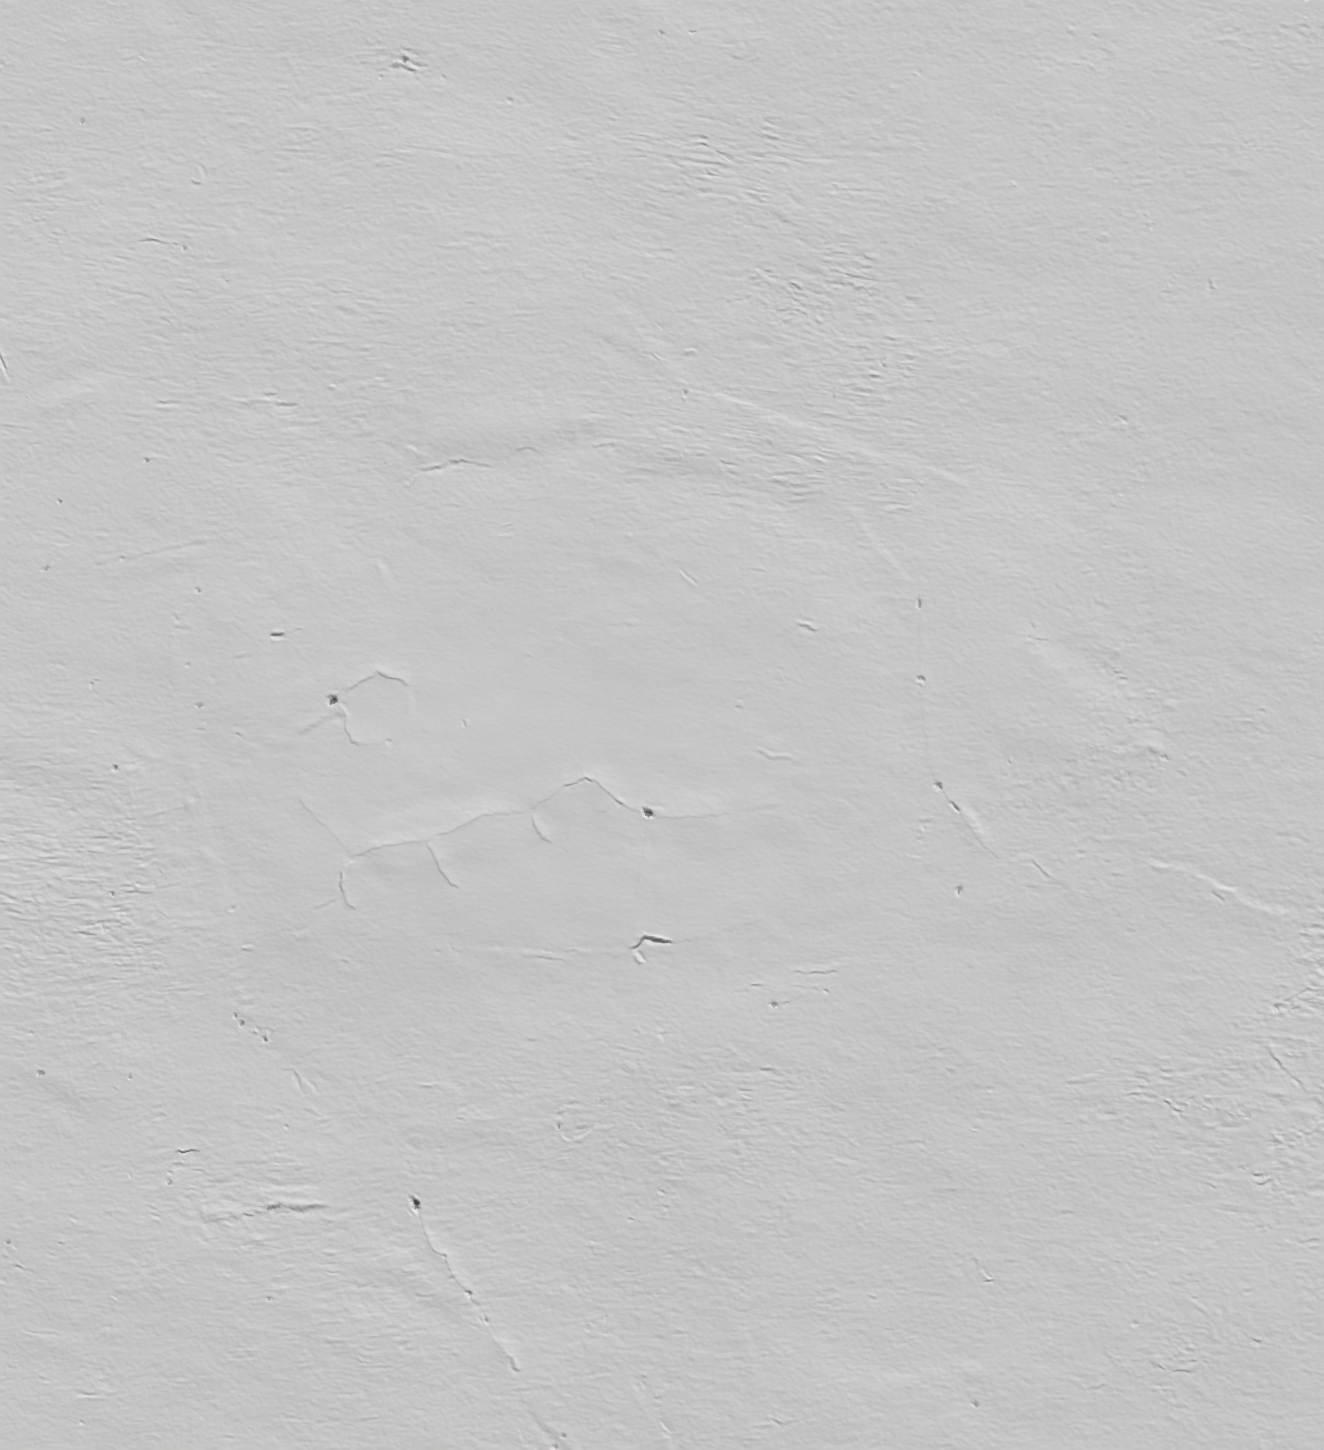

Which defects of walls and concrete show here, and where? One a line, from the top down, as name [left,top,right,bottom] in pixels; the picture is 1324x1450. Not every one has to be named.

crack [289,774,790,970]
crack [408,1195,569,1450]